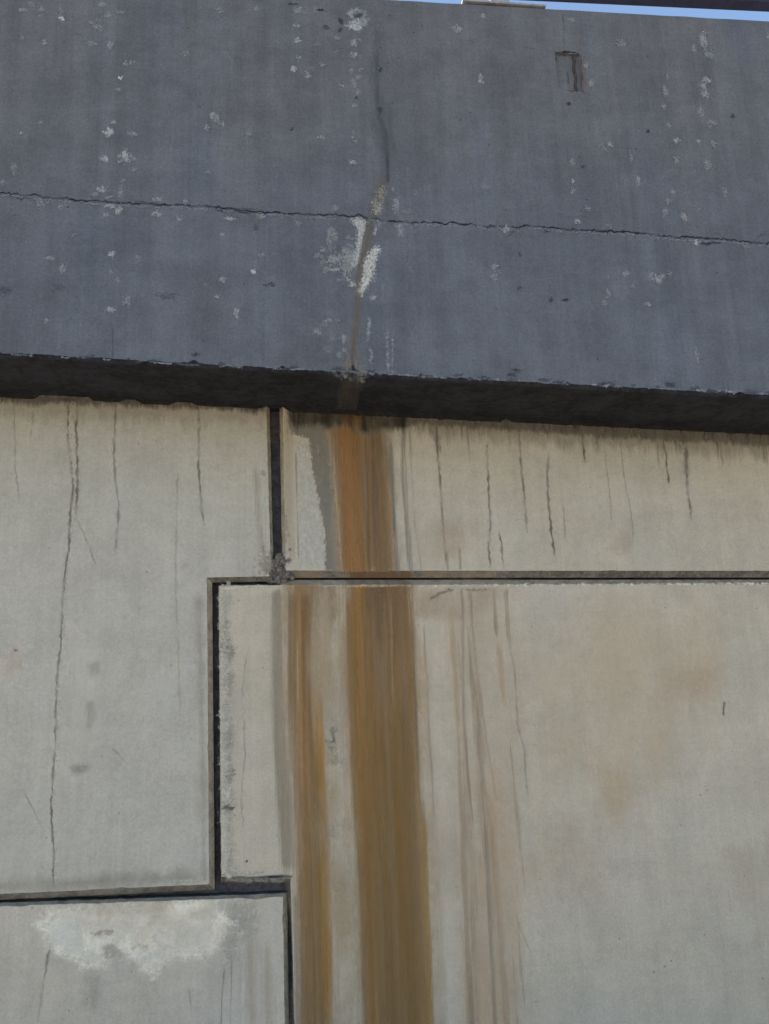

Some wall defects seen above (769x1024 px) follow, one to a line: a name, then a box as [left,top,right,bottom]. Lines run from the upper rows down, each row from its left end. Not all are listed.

rust [356,225,373,289]
crack [0,192,769,247]
crack [63,400,79,589]
spalling [220,517,296,612]
damp [298,440,324,569]
damp [487,471,503,565]
spalling [319,581,769,593]
damp [547,466,555,553]
rust [283,312,433,1024]
crack [50,614,63,880]
spalling [218,635,293,884]
damp [32,899,257,982]